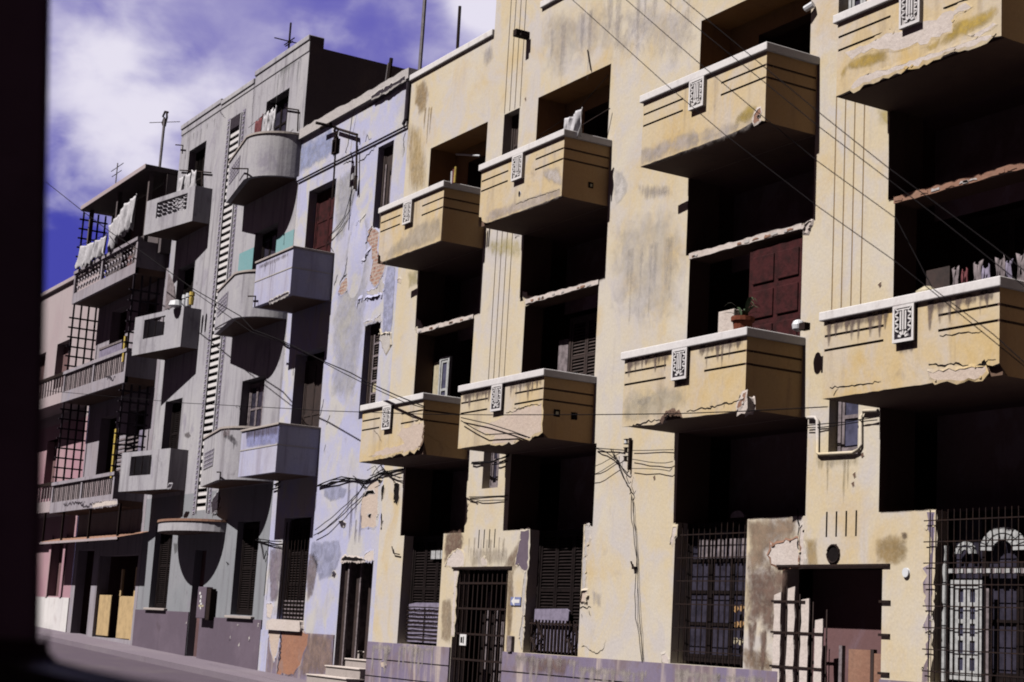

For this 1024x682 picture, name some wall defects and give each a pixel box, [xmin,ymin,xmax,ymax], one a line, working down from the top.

peeling [843,1,998,93]
flaking render [737,218,814,245]
flaking render [336,175,402,355]
flaking render [927,364,989,385]
peeling [369,420,424,460]
peeling [311,541,375,578]
flaking render [767,522,807,571]
damp [733,518,795,682]
flaking render [229,601,309,676]